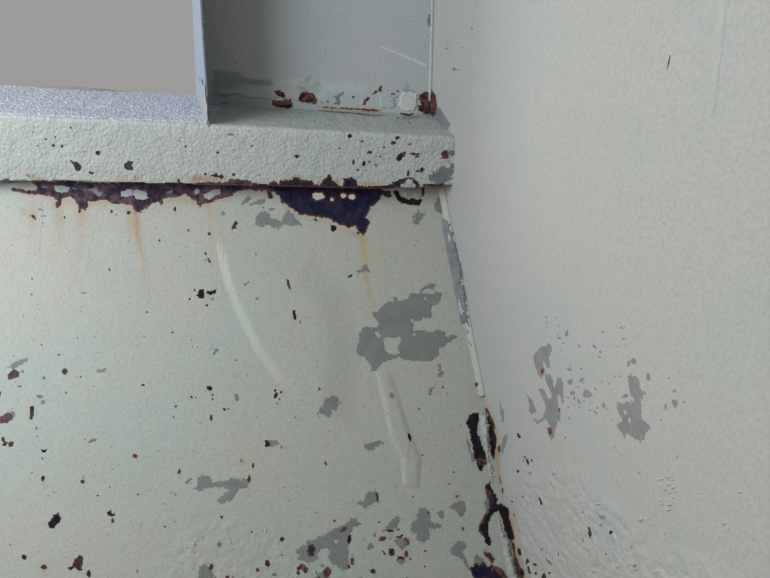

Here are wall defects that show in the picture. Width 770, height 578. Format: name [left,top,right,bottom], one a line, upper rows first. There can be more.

rust [272,73,333,109]
rust [417,90,438,117]
rust [70,160,165,183]
rust [0,170,238,313]
rust [177,136,401,318]
peeling [392,150,472,346]
peeling [355,282,457,377]
peeling [527,316,651,443]
peeling [185,474,251,504]
peeling [293,516,361,573]
peeling [409,499,467,544]
rust [475,399,552,578]